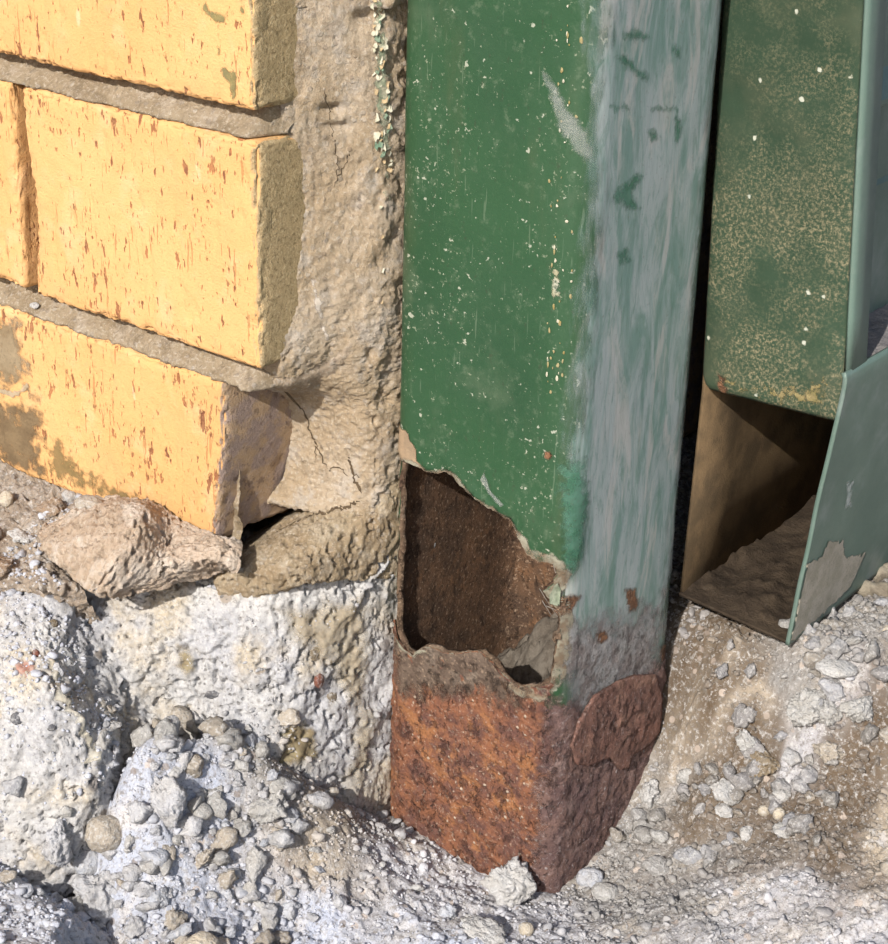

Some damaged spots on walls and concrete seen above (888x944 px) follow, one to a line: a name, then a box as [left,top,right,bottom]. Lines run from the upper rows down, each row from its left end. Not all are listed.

peeling [370,0,393,178]
damp [0,317,128,497]
crack [276,391,362,532]
corrosion [389,459,667,894]
peeling [791,540,865,641]